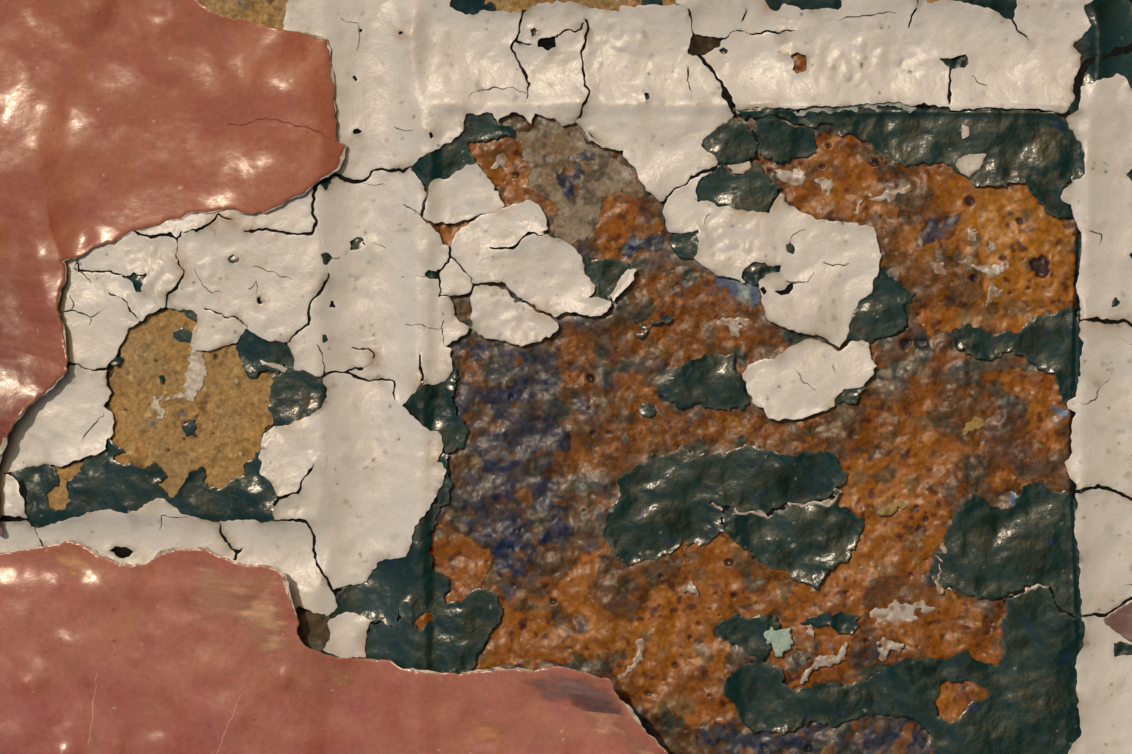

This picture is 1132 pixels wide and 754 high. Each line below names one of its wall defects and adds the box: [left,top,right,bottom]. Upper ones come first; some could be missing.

crack [62,166,428,328]
crack [469,10,591,120]
peeling [283,0,1093,348]
crack [687,54,760,159]
crack [1063,43,1132,118]
crack [273,464,336,618]
peeling [0,0,668,754]
crack [287,246,452,422]
rust [426,102,1079,754]
peeling [742,338,877,421]
crack [1076,485,1132,501]
rust [413,611,433,629]